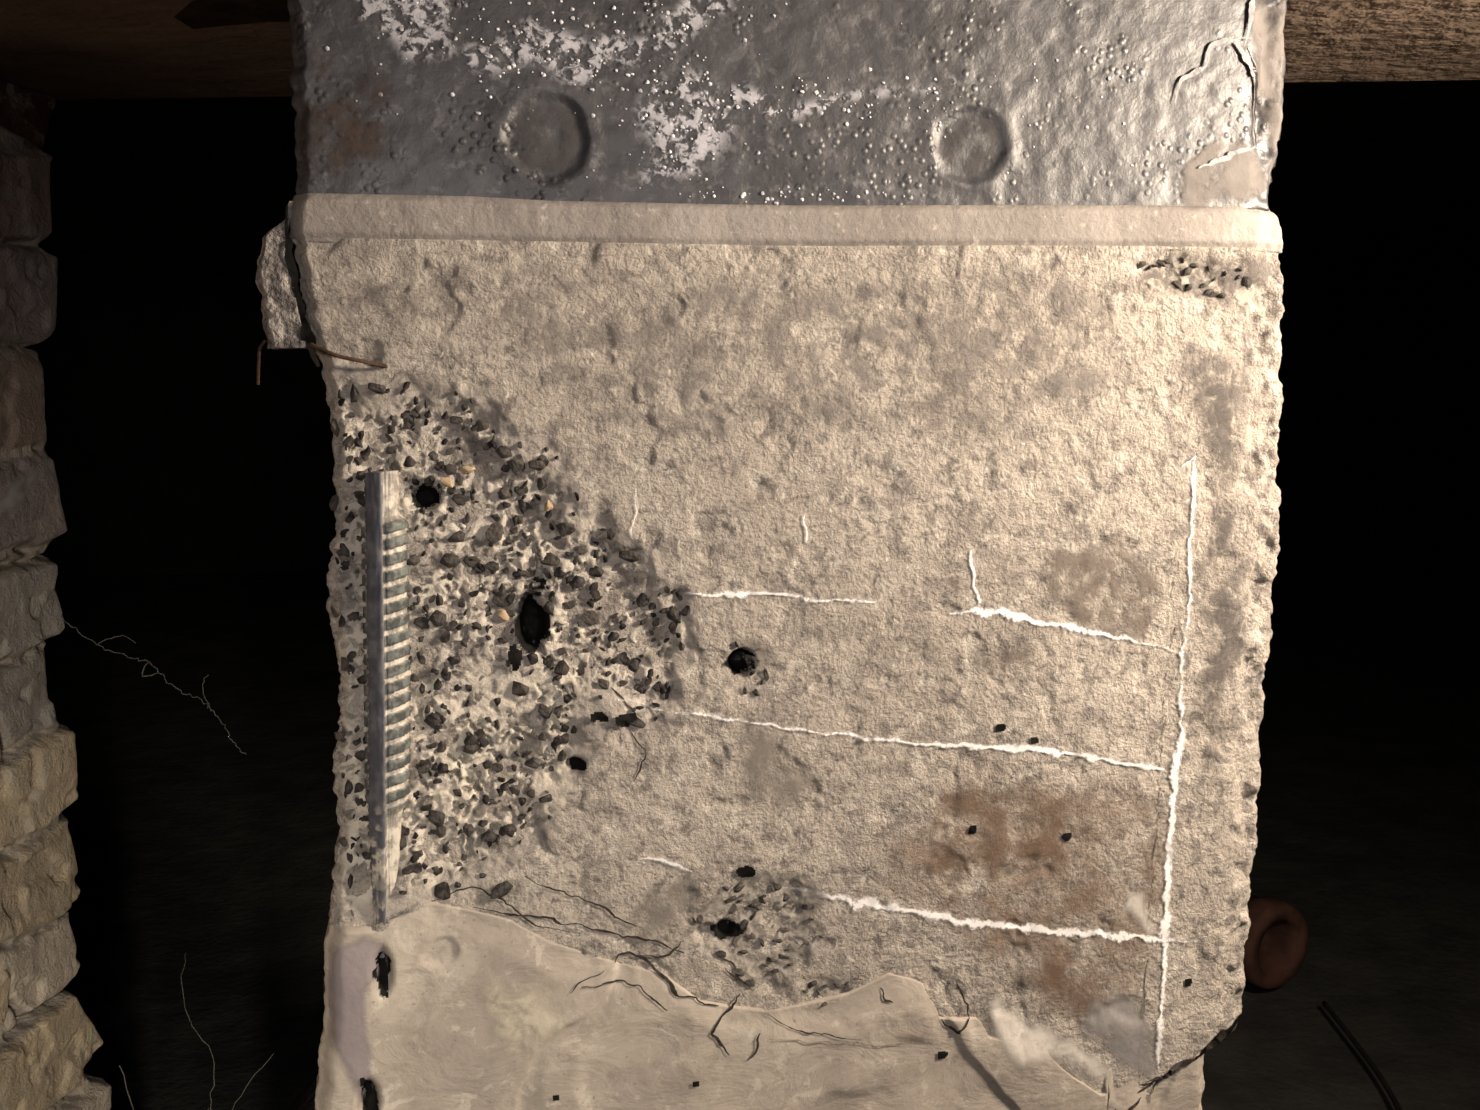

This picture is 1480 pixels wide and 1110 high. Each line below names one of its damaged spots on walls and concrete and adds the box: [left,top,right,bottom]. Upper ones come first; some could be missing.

water stain [361,0,885,198]
water stain [906,78,960,138]
water stain [740,185,905,205]
spalling [255,201,700,932]
crack [612,688,646,781]
spalling [373,952,391,998]
crack [433,876,900,1061]
crack [941,981,970,1034]
crack [1115,1024,1237,1110]